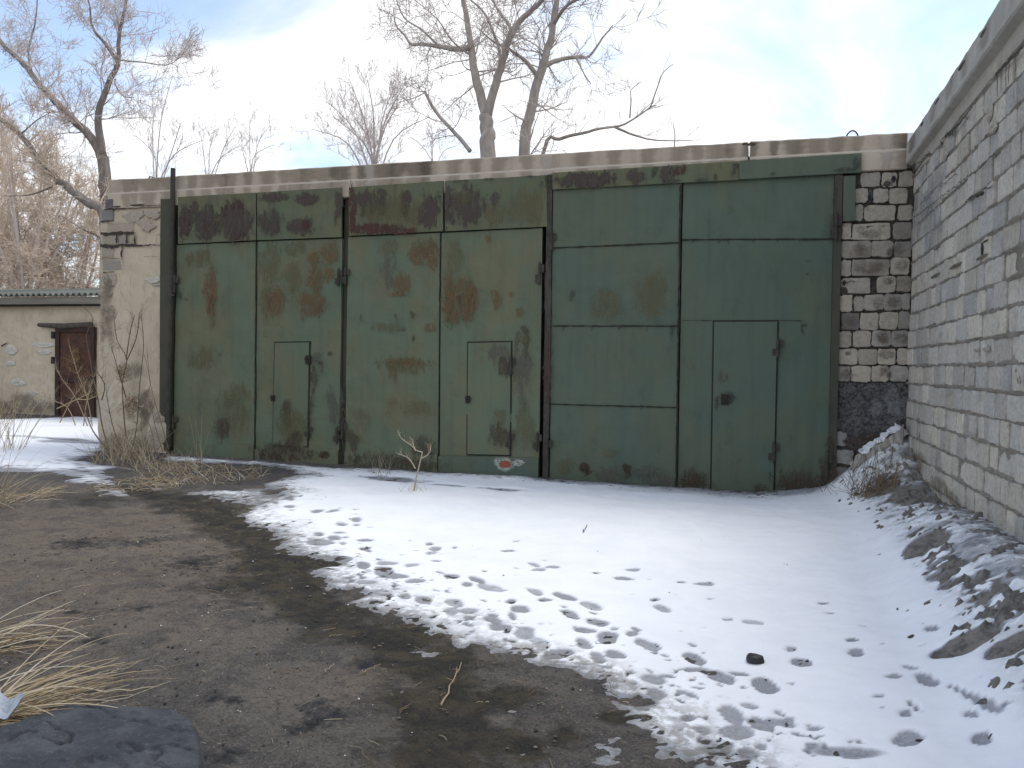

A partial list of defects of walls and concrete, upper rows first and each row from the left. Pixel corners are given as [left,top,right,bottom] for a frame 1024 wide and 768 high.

rust [529,164,686,189]
rust [178,192,320,326]
rust [334,178,499,297]
rust [248,352,438,471]